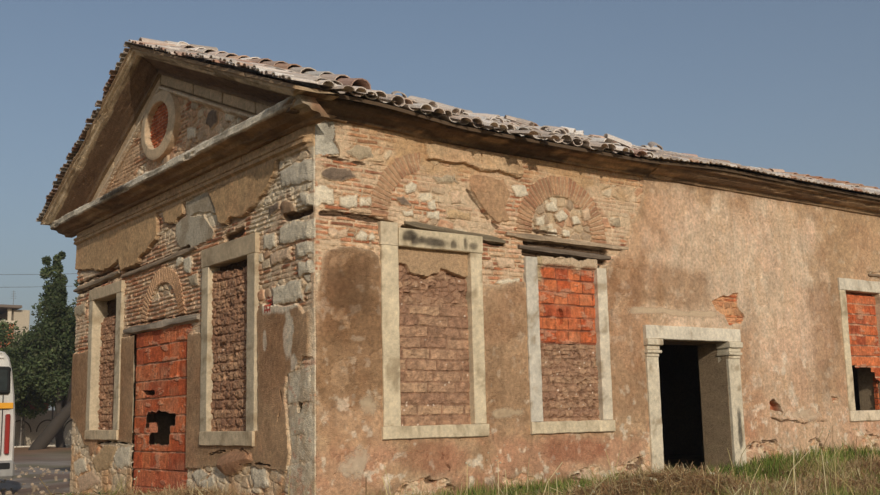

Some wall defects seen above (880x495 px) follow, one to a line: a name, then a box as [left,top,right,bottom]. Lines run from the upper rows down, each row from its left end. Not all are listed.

spalling [74,120,643,354]
spalling [712,293,744,325]
spalling [146,410,159,433]
spalling [69,420,134,495]
spalling [569,454,650,485]
spalling [746,440,783,466]
spalling [861,433,880,452]
spalling [395,476,457,495]